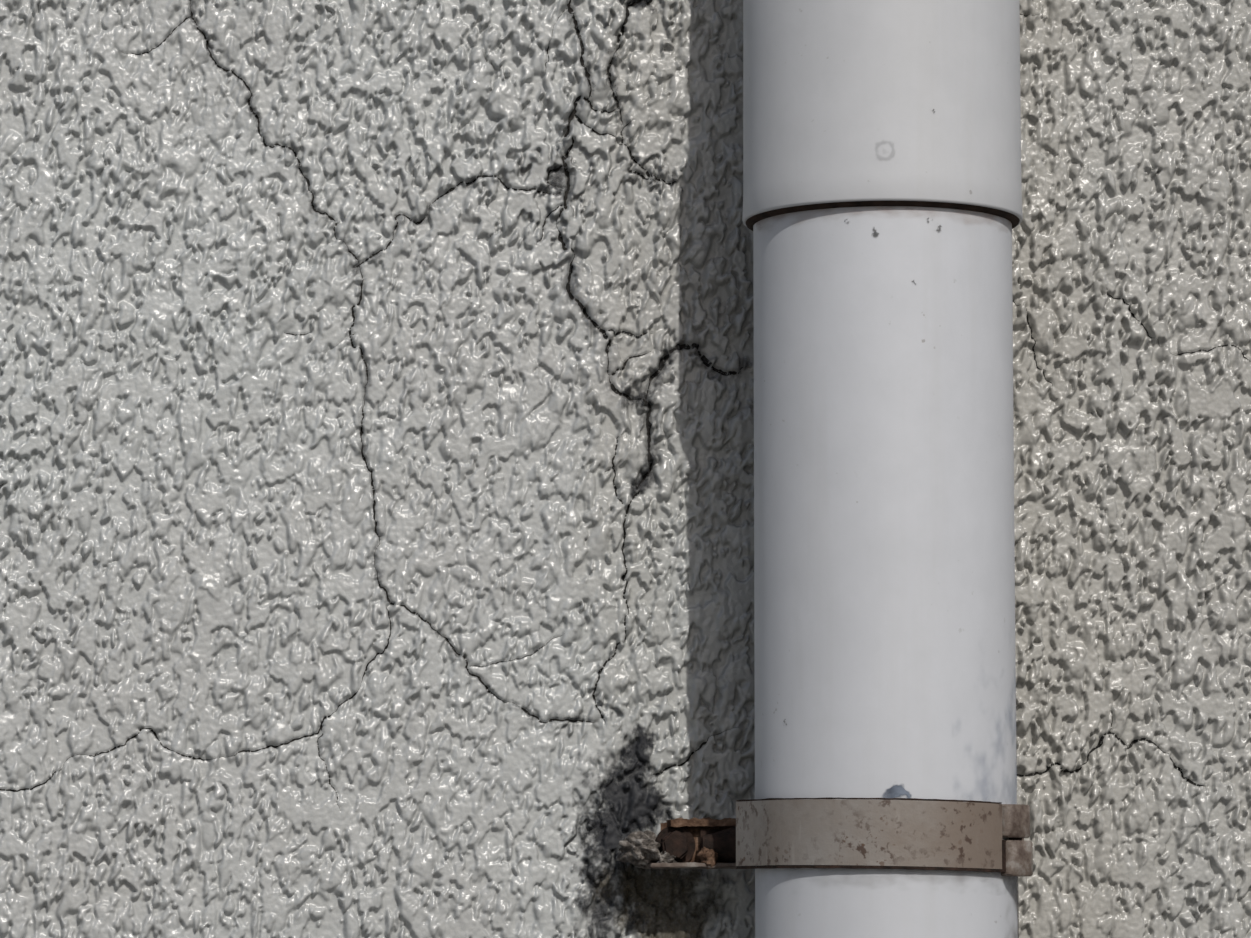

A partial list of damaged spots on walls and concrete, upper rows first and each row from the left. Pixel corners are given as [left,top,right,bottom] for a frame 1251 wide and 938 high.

crack [0,0,743,811]
crack [1016,705,1207,786]
leakage [575,724,673,938]
corrosion [601,847,722,938]
corrosion [736,840,1006,872]